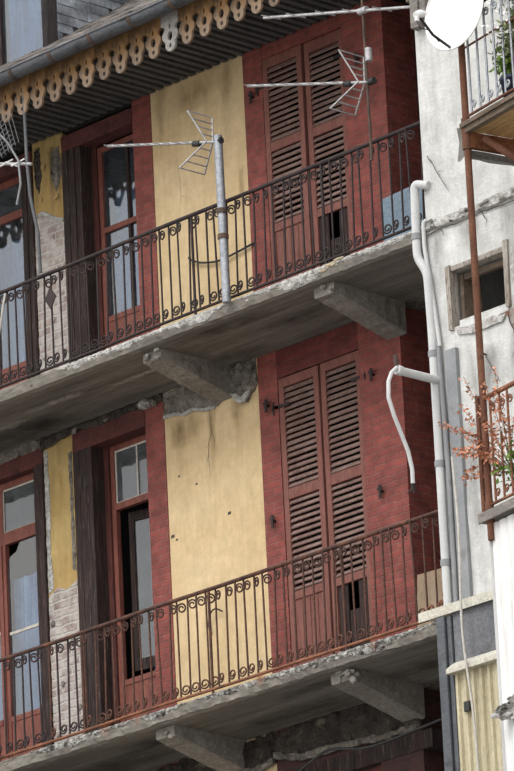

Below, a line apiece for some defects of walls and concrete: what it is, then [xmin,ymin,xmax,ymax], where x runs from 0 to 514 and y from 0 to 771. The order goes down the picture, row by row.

flaking render [0,146,412,404]
flaking render [0,386,436,771]